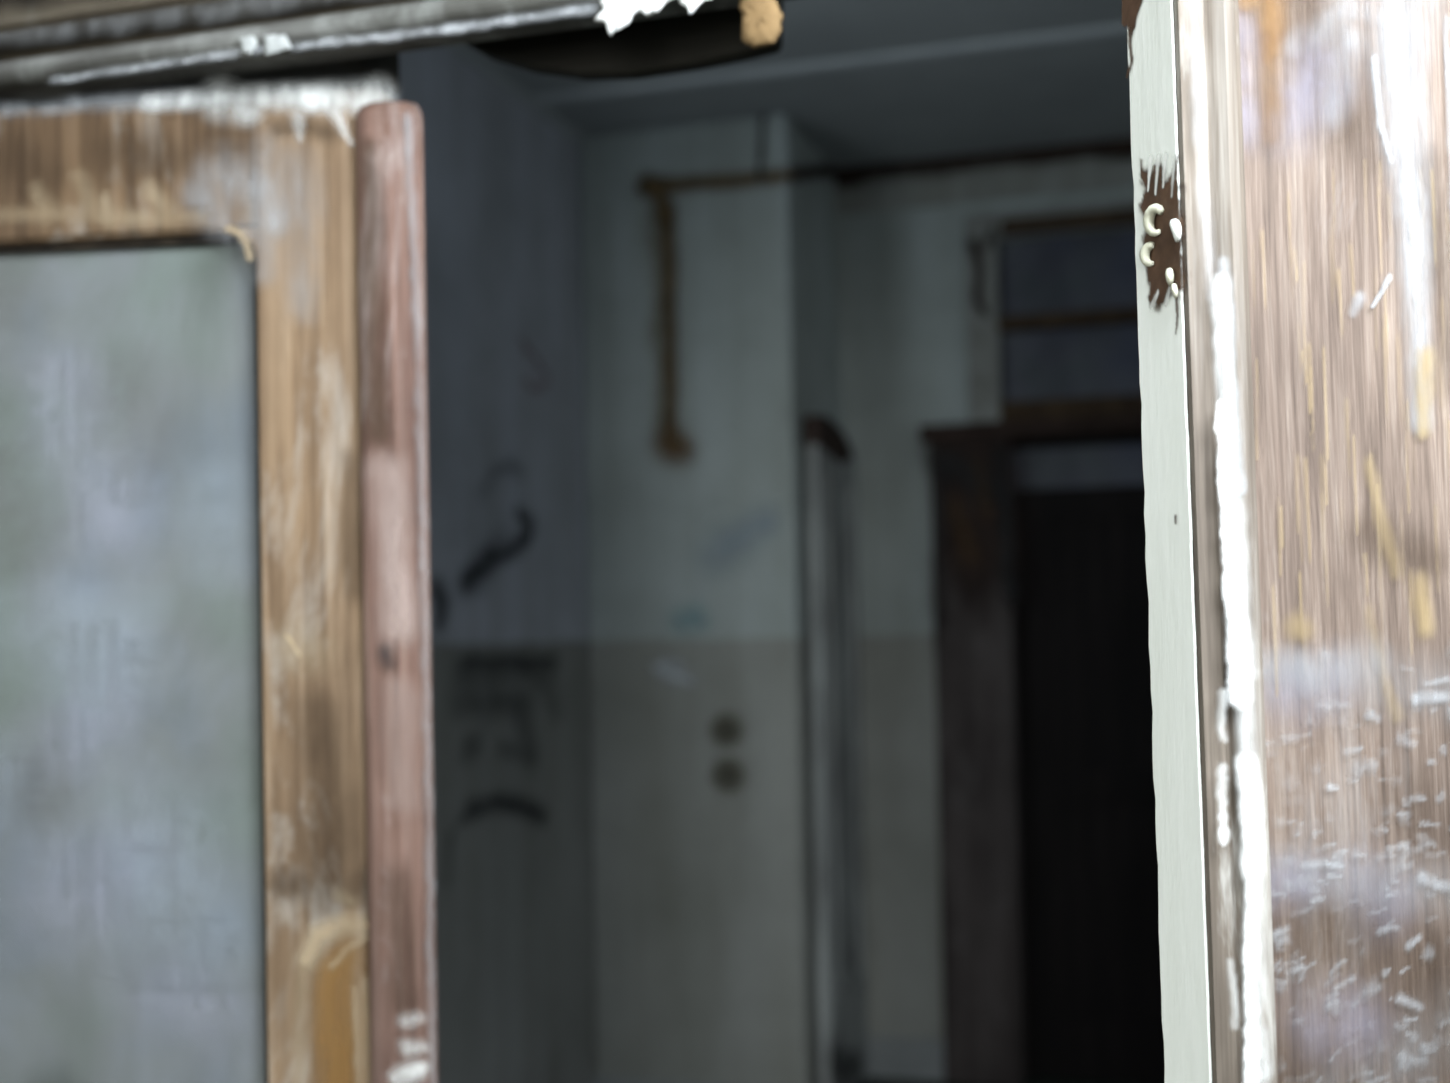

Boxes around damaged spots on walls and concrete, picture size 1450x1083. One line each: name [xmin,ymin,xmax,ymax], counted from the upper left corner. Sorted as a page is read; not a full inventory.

peeling [594,0,708,36]
spalling [1139,156,1186,334]